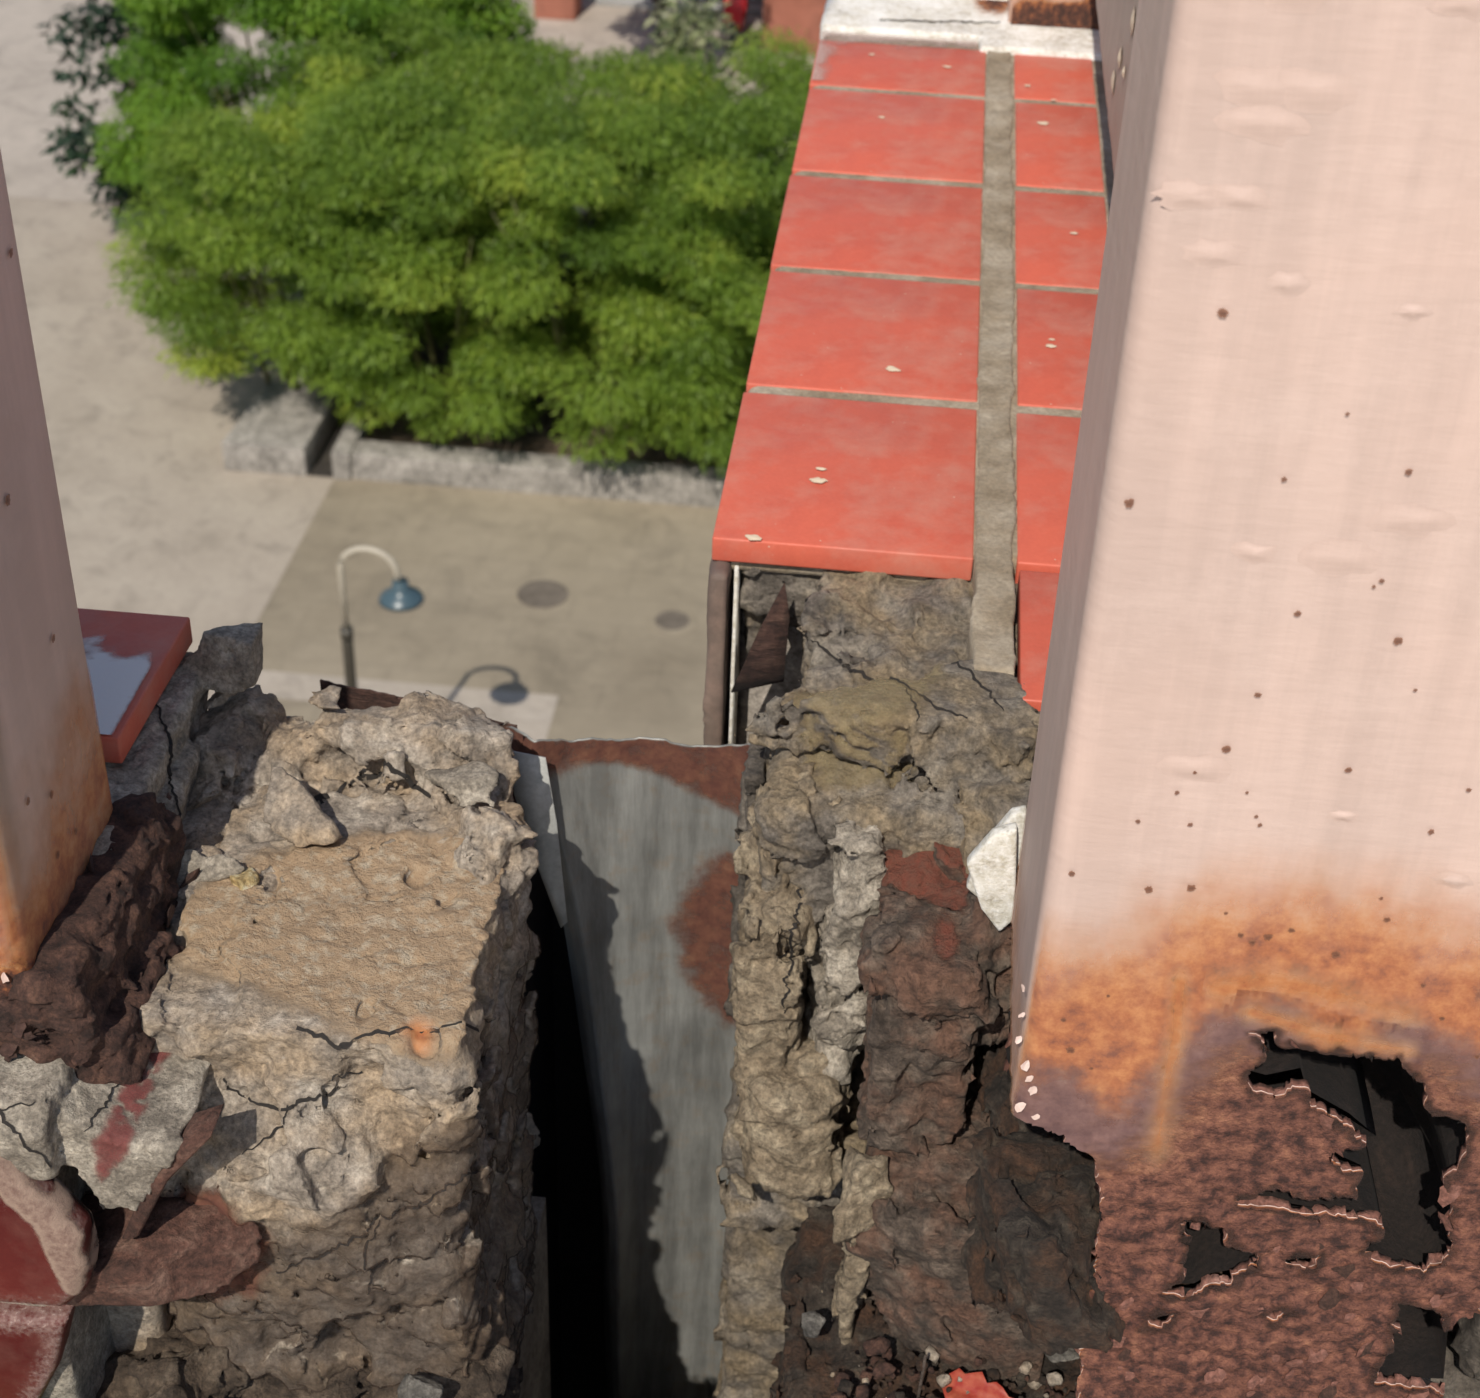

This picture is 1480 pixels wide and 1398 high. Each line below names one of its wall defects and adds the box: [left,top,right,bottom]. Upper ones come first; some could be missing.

rust [975,0,1099,30]
crack [811,640,1004,721]
rust [504,727,750,815]
rust [0,711,201,1086]
spalling [167,830,505,1066]
rust [671,853,738,1022]
peeling [881,805,1027,931]
crack [0,1102,52,1168]
crack [83,1084,119,1132]
crack [223,1021,479,1154]
peeling [1015,1060,1040,1120]
rust [1013,897,1480,1398]